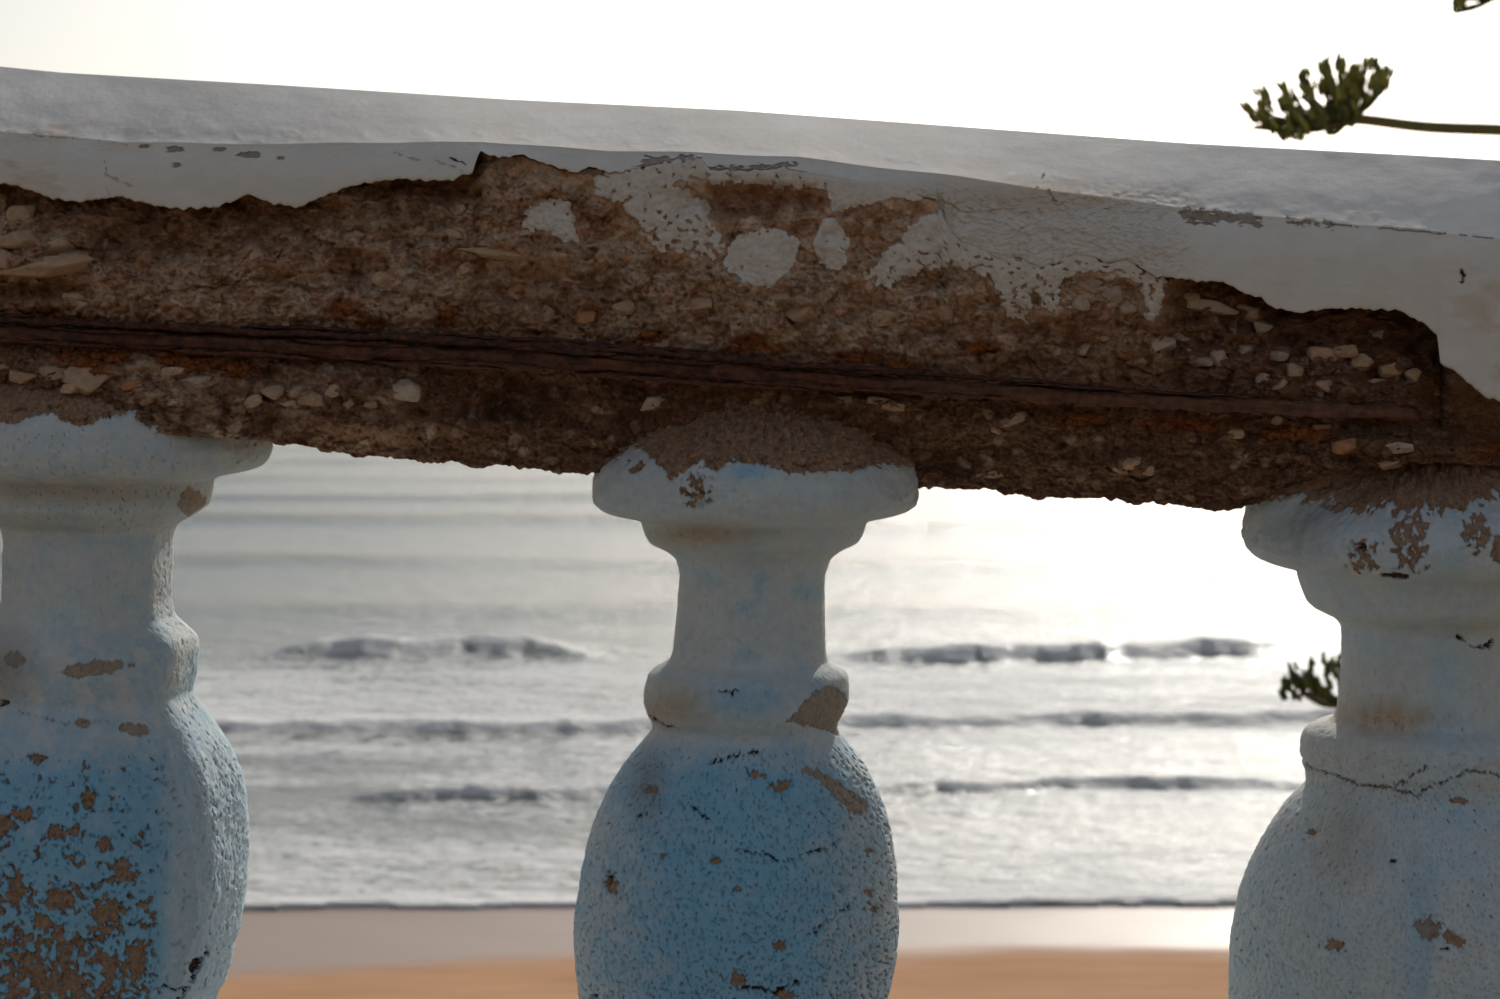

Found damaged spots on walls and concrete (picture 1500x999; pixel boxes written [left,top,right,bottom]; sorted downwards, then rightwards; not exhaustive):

peeling [214,148,260,158]
corrosion [330,299,383,330]
corrosion [54,348,128,376]
spalling [0,151,1500,574]
peeling [63,659,135,679]
peeling [75,718,91,728]
peeling [119,722,150,737]
peeling [786,686,849,735]
crack [1306,763,1500,794]
peeling [0,754,161,999]
peeling [726,750,897,999]
peeling [578,844,627,942]